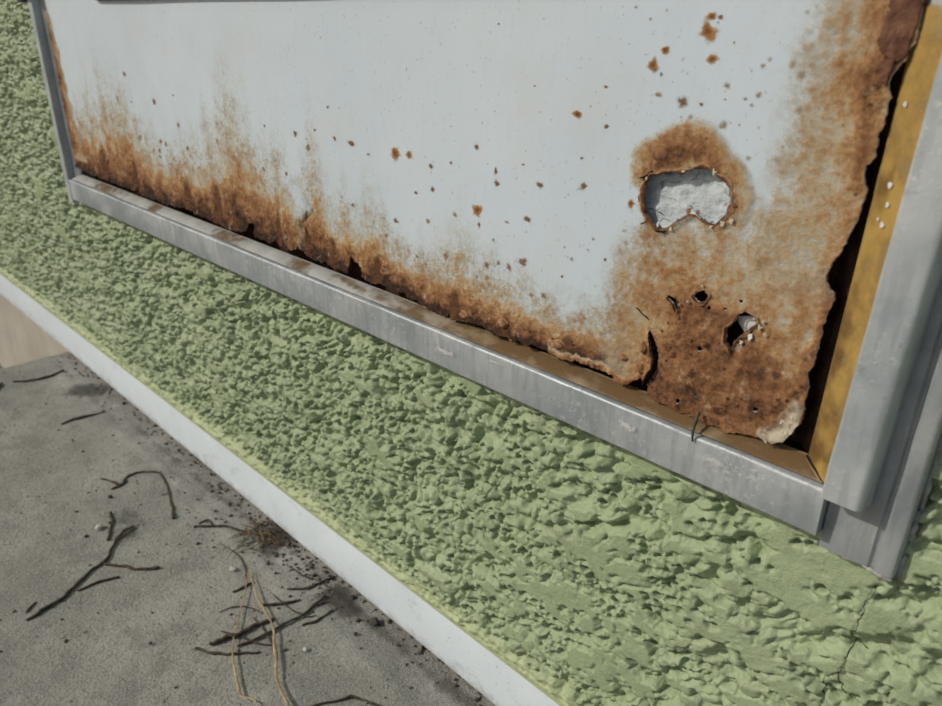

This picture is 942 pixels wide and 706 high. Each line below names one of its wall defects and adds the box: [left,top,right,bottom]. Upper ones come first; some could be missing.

corrosion [44,0,942,482]
crack [819,585,877,706]